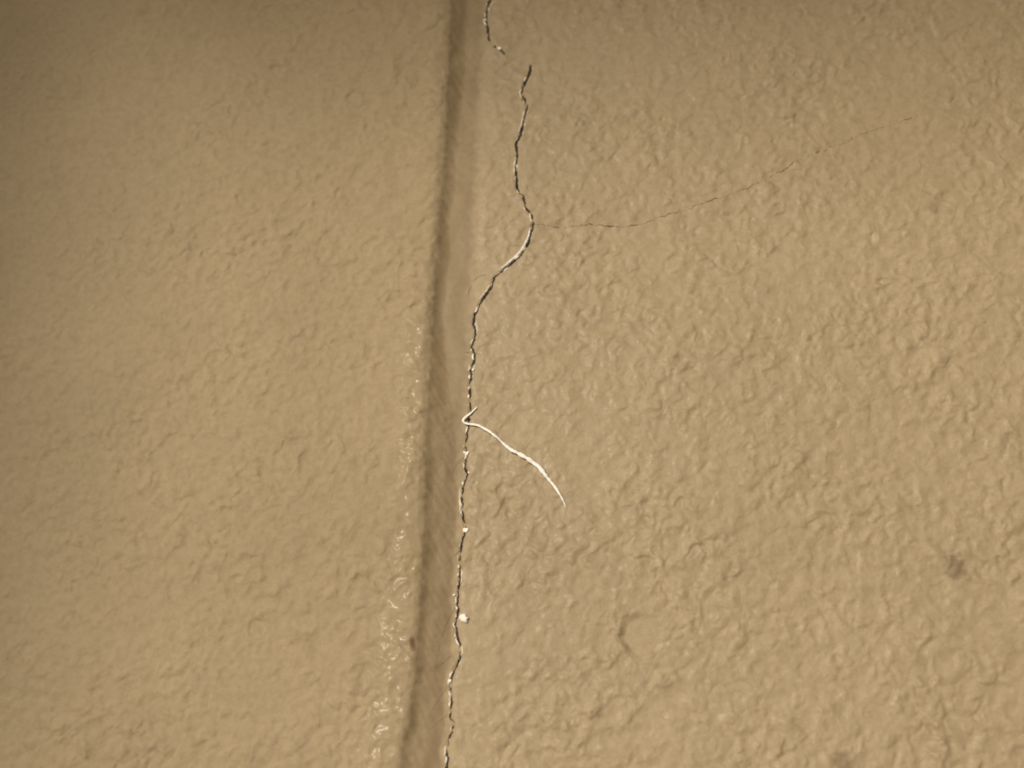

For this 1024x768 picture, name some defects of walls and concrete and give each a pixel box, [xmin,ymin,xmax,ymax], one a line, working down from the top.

crack [483,0,506,54]
crack [431,65,918,768]